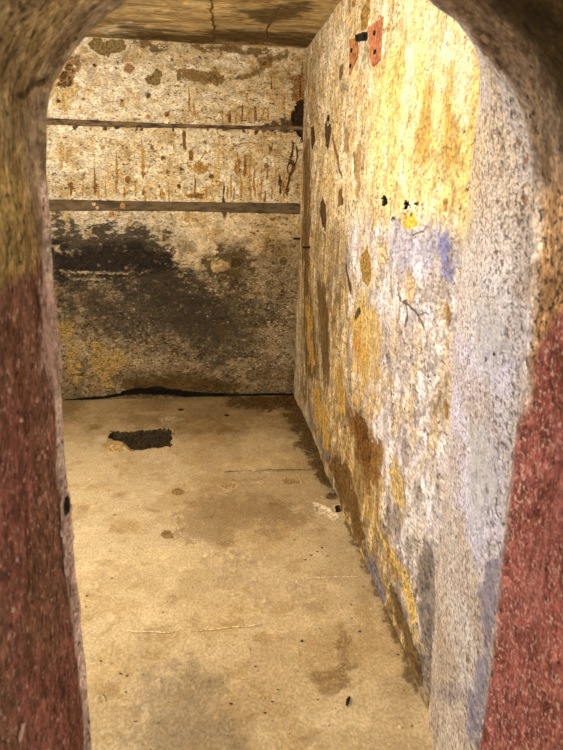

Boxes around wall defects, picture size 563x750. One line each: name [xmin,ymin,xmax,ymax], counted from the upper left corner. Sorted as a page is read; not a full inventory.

crack [208,0,216,40]
corrosion [93,93,290,202]
damp [51,140,347,499]
crack [397,288,429,340]
damp [412,386,421,427]
damp [388,427,410,510]
damp [344,518,419,692]